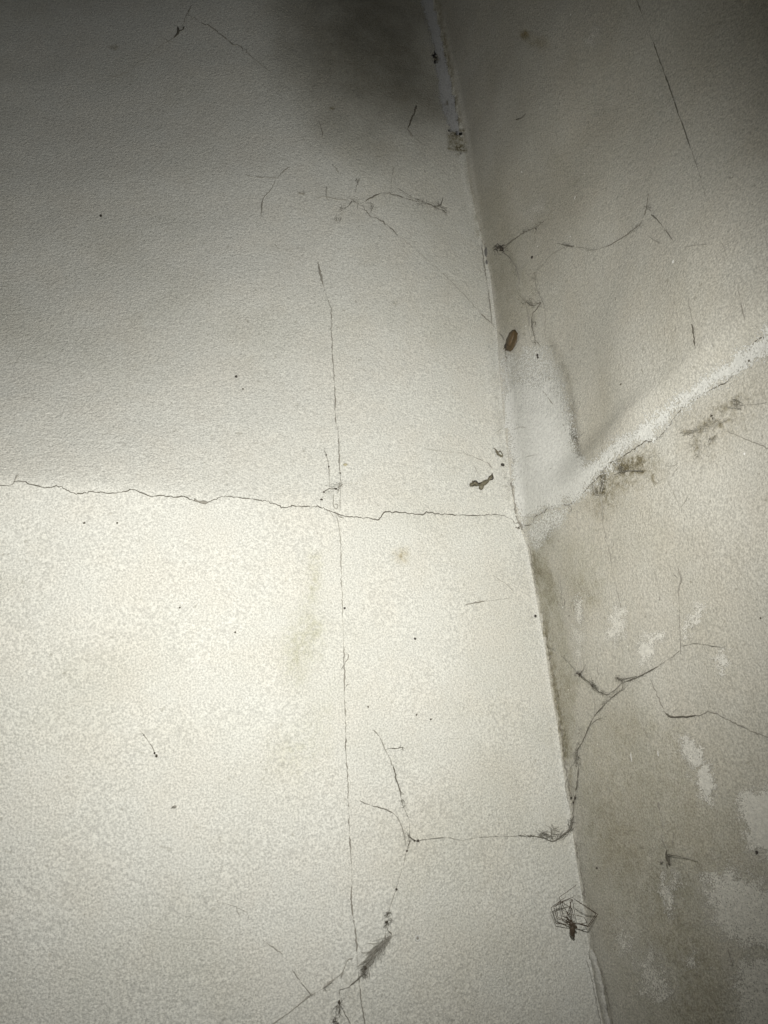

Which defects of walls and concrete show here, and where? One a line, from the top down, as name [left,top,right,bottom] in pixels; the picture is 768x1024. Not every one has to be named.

crack [247,167,289,217]
crack [0,240,768,1024]
water stain [602,597,713,667]
water stain [675,733,721,807]
water stain [655,777,768,1024]
water stain [609,912,711,1010]